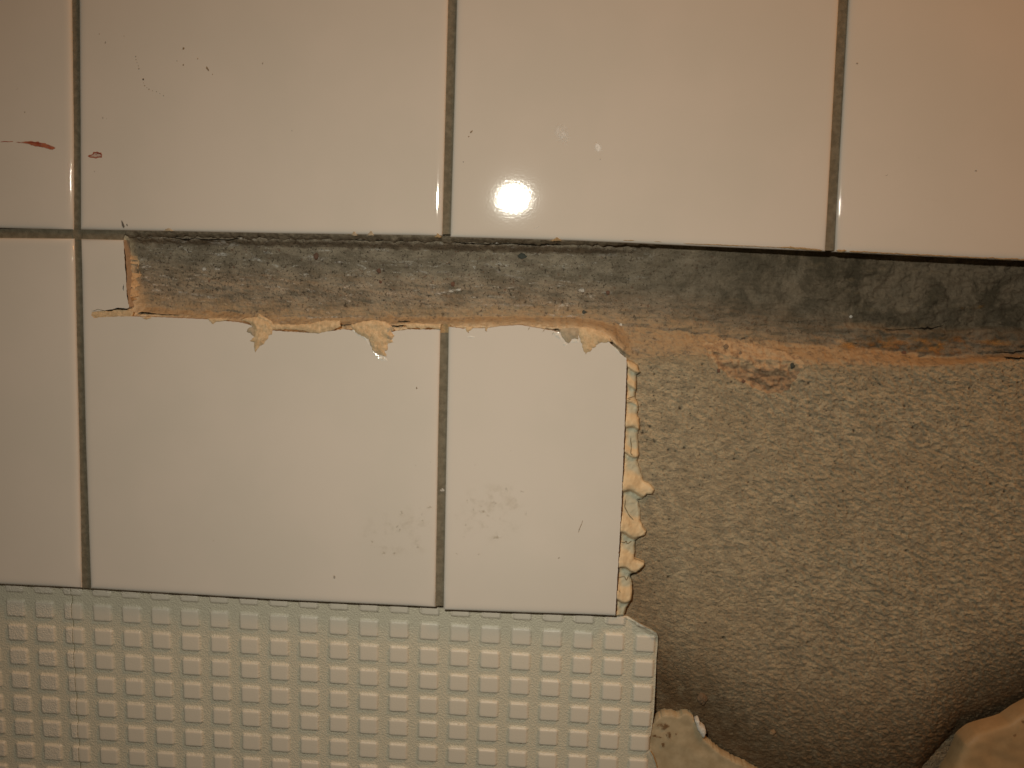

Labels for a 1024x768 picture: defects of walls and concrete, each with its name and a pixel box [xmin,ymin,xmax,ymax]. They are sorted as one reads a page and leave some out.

spalling [702,339,804,394]
peeling [694,715,706,738]